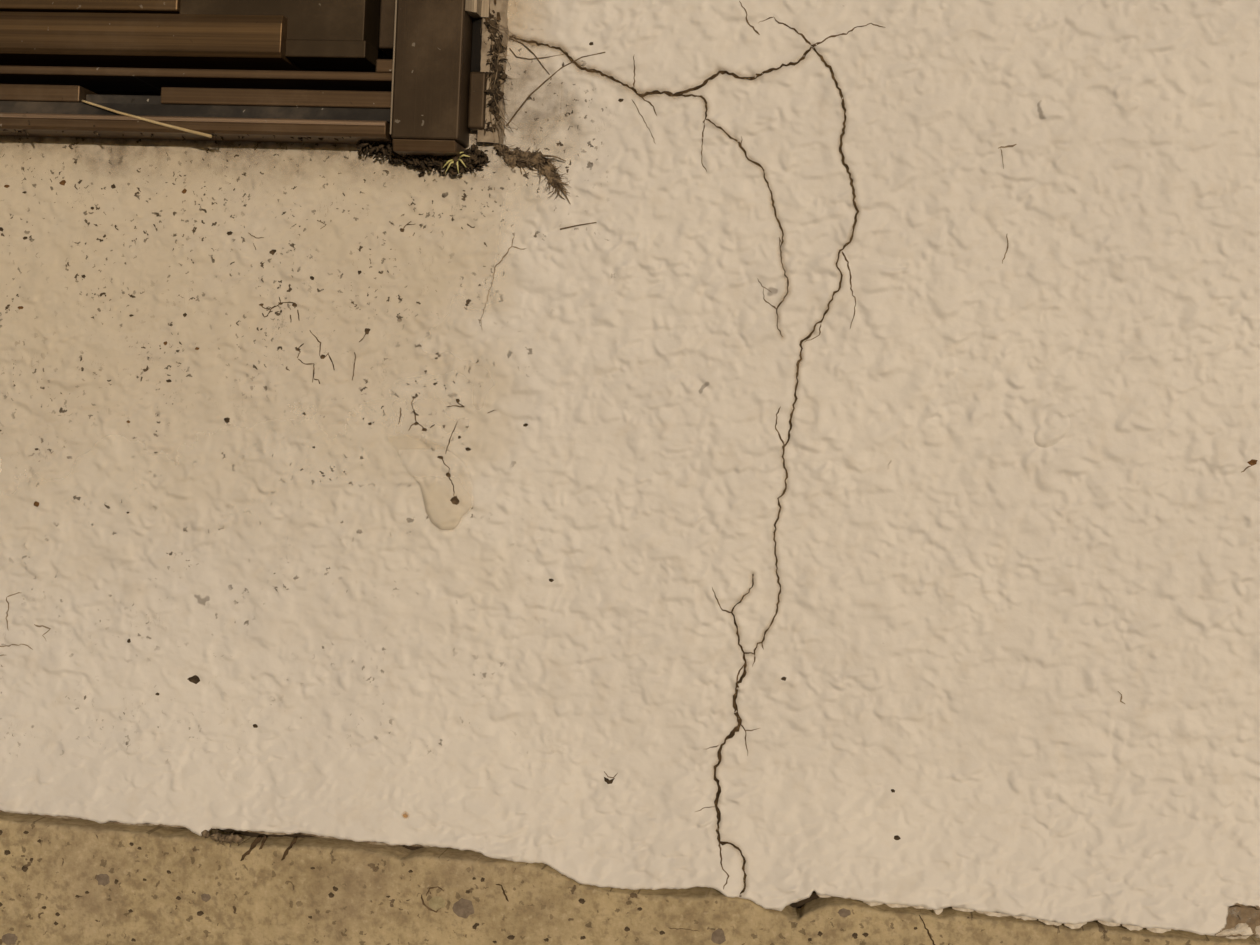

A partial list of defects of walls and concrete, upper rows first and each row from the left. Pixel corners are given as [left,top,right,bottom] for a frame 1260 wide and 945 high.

crack [481,0,886,897]
spalling [1215,903,1260,939]